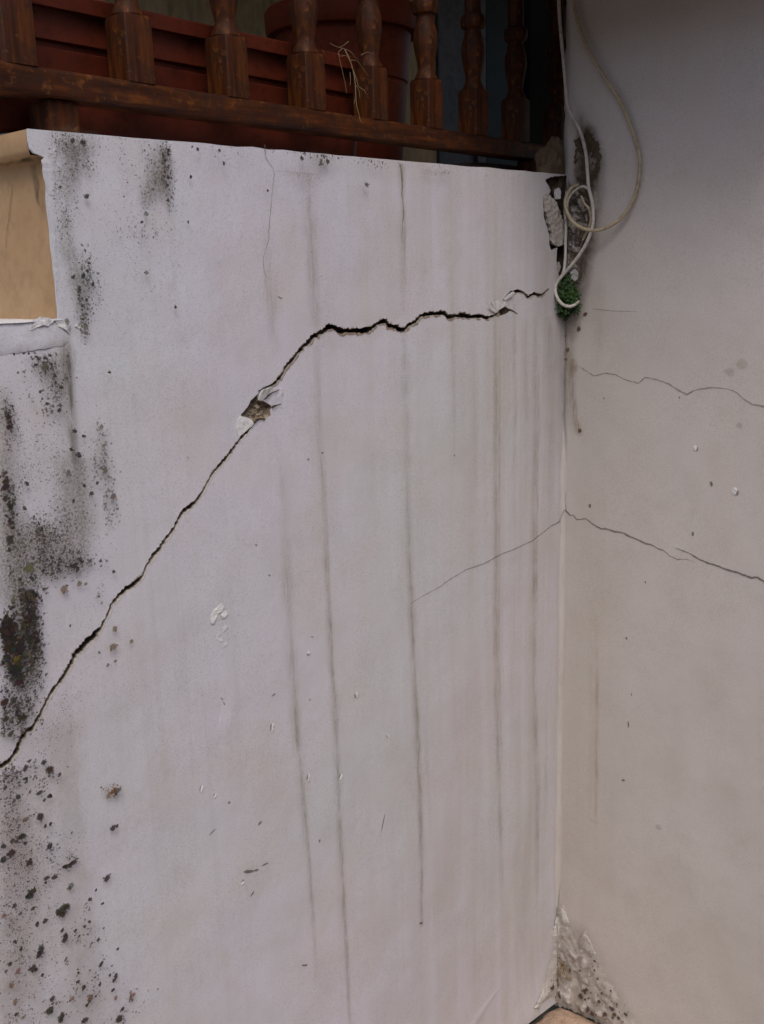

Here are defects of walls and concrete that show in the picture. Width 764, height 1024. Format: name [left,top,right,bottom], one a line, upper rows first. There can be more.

mould [47,133,184,345]
spalling [543,128,598,306]
spalling [236,387,284,437]
crack [258,288,549,392]
crack [635,377,721,395]
damp [0,348,145,1024]
crack [0,425,254,771]
crack [555,508,764,582]